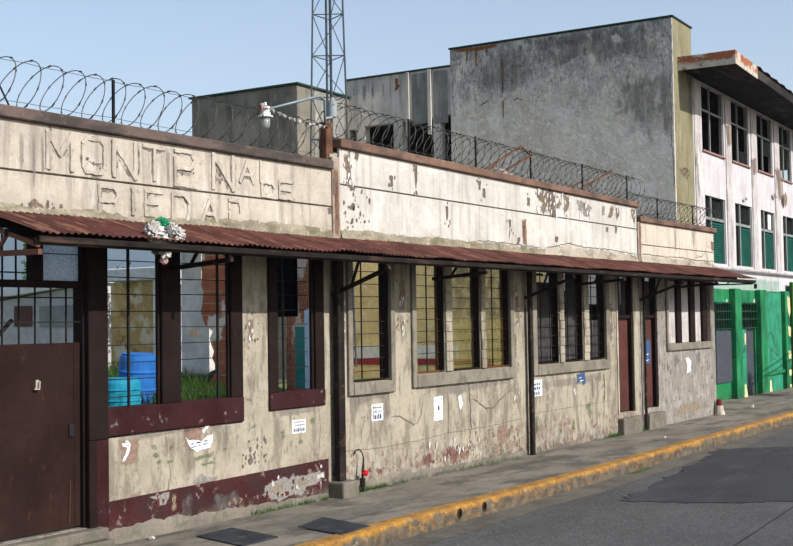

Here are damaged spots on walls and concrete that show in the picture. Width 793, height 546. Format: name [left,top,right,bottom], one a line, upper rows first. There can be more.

rust [455,44,496,66]
spalling [341,151,715,268]
flaking render [108,465,328,545]